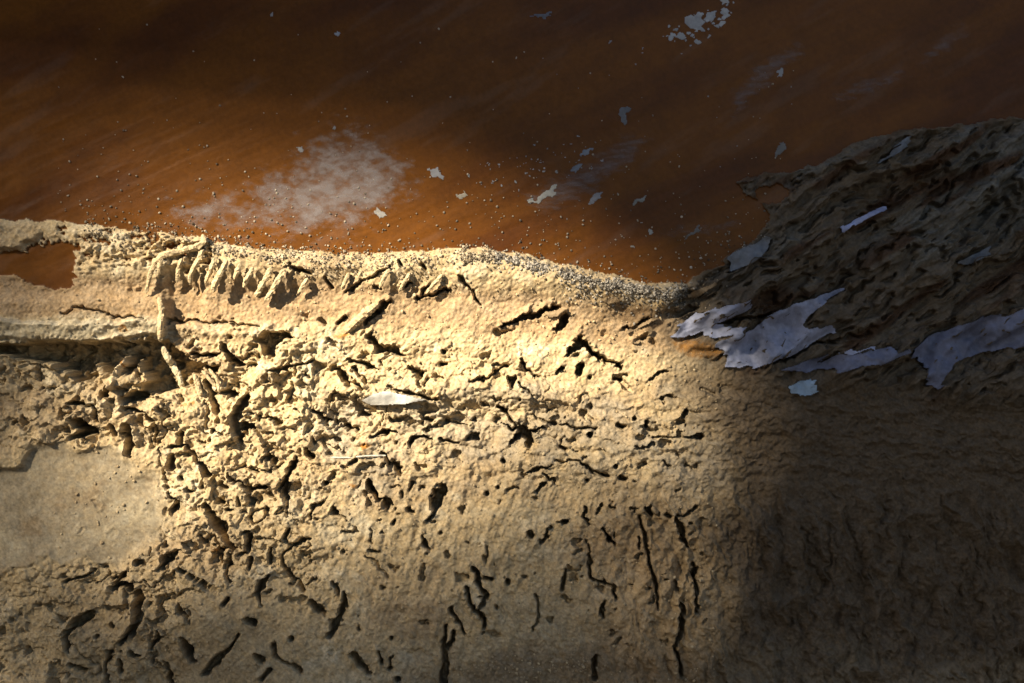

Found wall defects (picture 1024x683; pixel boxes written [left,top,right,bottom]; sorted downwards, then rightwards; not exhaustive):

peeling [663,0,734,54]
peeling [840,206,887,232]
crack [60,306,262,329]
peeling [670,288,1024,396]
spalling [388,388,441,403]
crack [531,414,598,433]
crack [554,459,612,480]
crack [279,537,319,595]
crack [586,543,619,603]
crack [637,515,662,614]
crack [200,633,241,678]
crack [439,624,457,683]